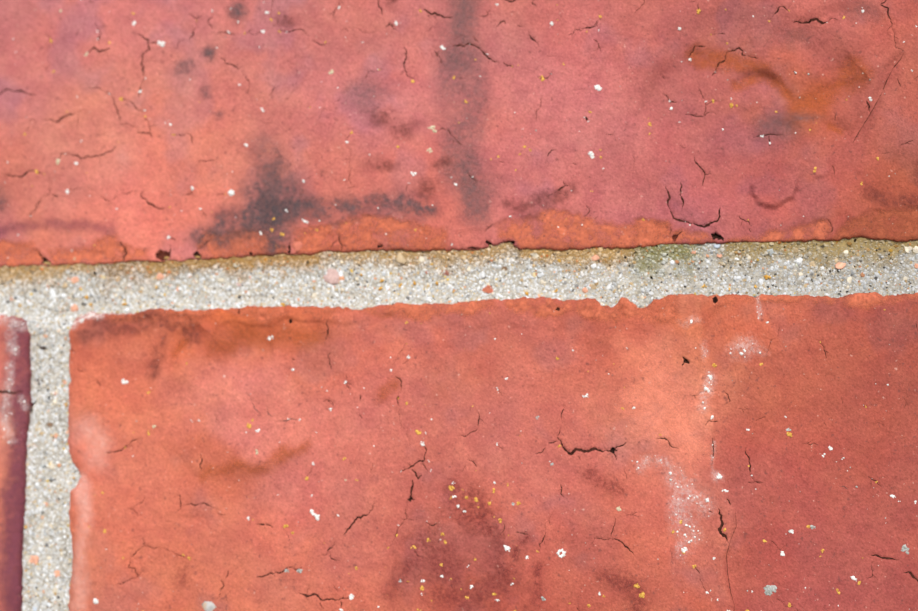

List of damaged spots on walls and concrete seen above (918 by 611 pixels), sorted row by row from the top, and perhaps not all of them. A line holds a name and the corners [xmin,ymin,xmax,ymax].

crack [89,1,360,137]
crack [424,9,513,67]
crack [663,29,756,117]
crack [769,5,837,25]
crack [5,150,113,265]
leakage [193,194,435,256]
crack [665,147,751,233]
crack [389,349,435,547]
crack [536,409,627,477]
crack [326,507,373,561]
crack [710,499,731,541]
crack [258,566,349,608]